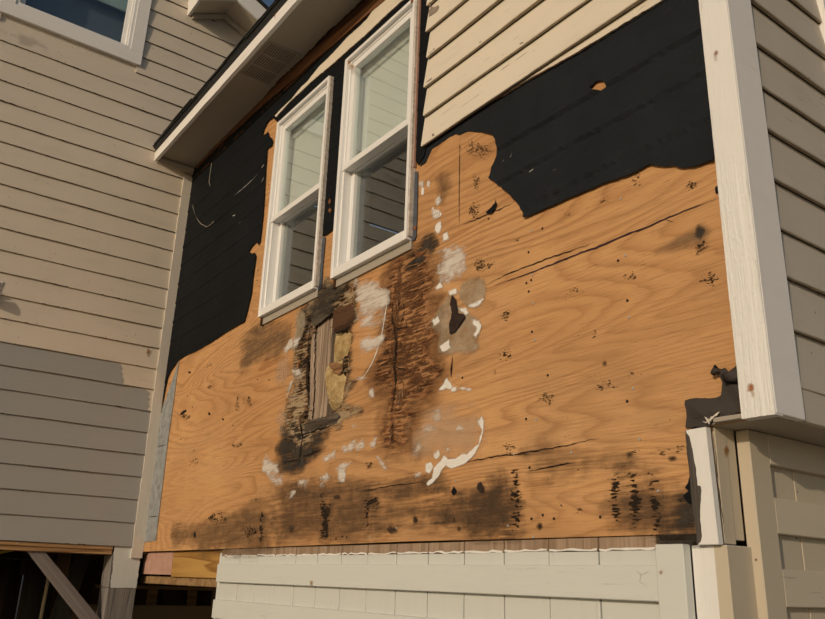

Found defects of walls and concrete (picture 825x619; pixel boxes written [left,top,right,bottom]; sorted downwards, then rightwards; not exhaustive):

crack [492,199,715,285]
water stain [303,281,346,319]
water stain [360,187,450,469]
water stain [174,512,267,548]
water stain [270,424,441,540]
water stain [436,469,522,535]
crack [466,439,591,471]
water stain [609,473,697,541]